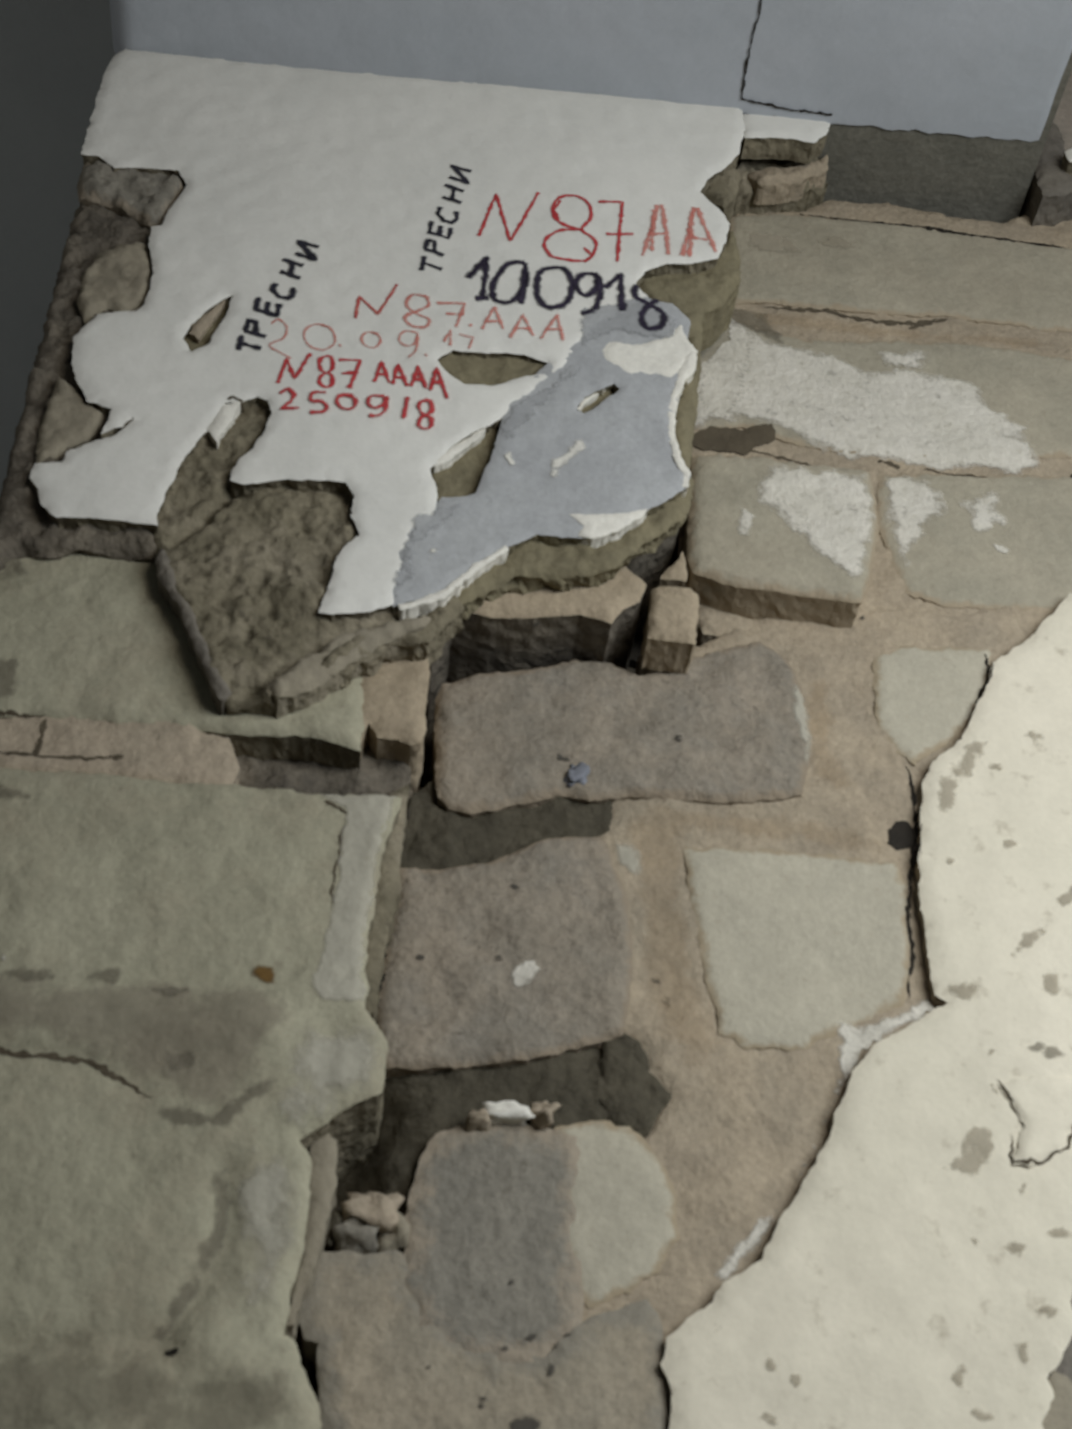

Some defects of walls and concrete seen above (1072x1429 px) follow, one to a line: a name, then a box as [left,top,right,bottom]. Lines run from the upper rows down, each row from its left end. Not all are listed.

crack [741,0,832,116]
peeling [0,155,829,719]
crack [976,654,993,704]
crack [0,710,124,761]
hole [888,821,915,850]
crack [905,767,922,998]
crack [0,1046,152,1098]
peeling [996,1076,1072,1168]
crack [998,1080,1072,1165]
flaking render [1042,1337,1072,1429]